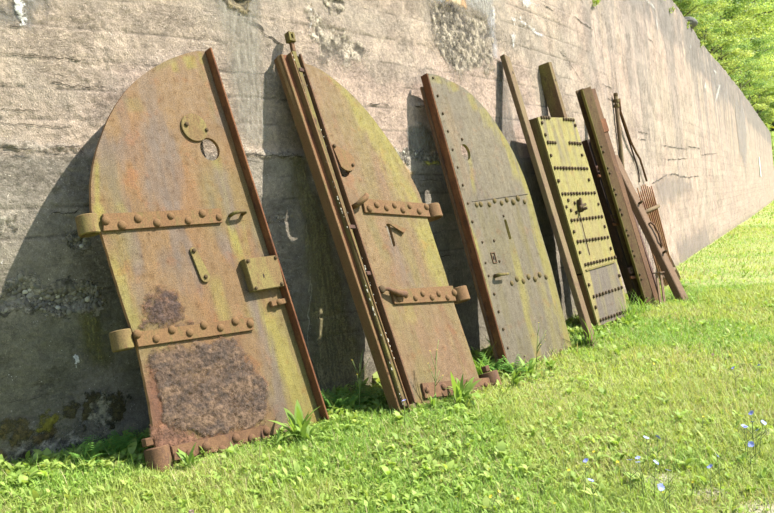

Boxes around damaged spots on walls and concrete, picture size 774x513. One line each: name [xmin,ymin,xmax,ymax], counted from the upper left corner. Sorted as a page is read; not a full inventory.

water stain [0,0,38,26]
spalling [223,0,252,17]
crack [235,9,283,45]
spalling [430,0,495,79]
crack [638,131,715,184]